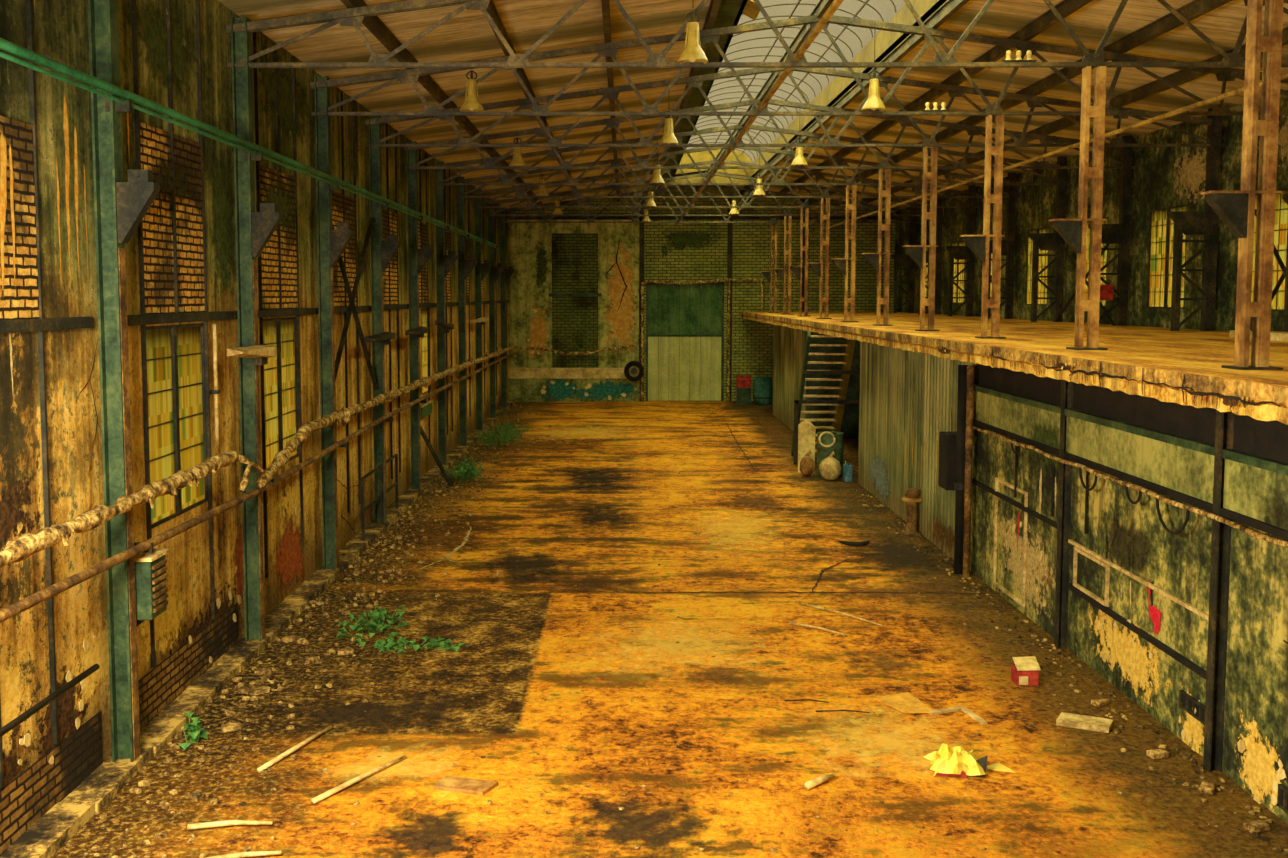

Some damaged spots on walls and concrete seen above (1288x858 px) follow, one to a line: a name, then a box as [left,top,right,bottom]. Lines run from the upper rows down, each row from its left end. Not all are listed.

flaking render [0,476,41,550]
water stain [1030,425,1066,514]
water stain [1105,516,1161,635]
flaking render [0,627,109,786]
flaking render [1085,605,1204,754]
flaking render [1235,710,1287,814]